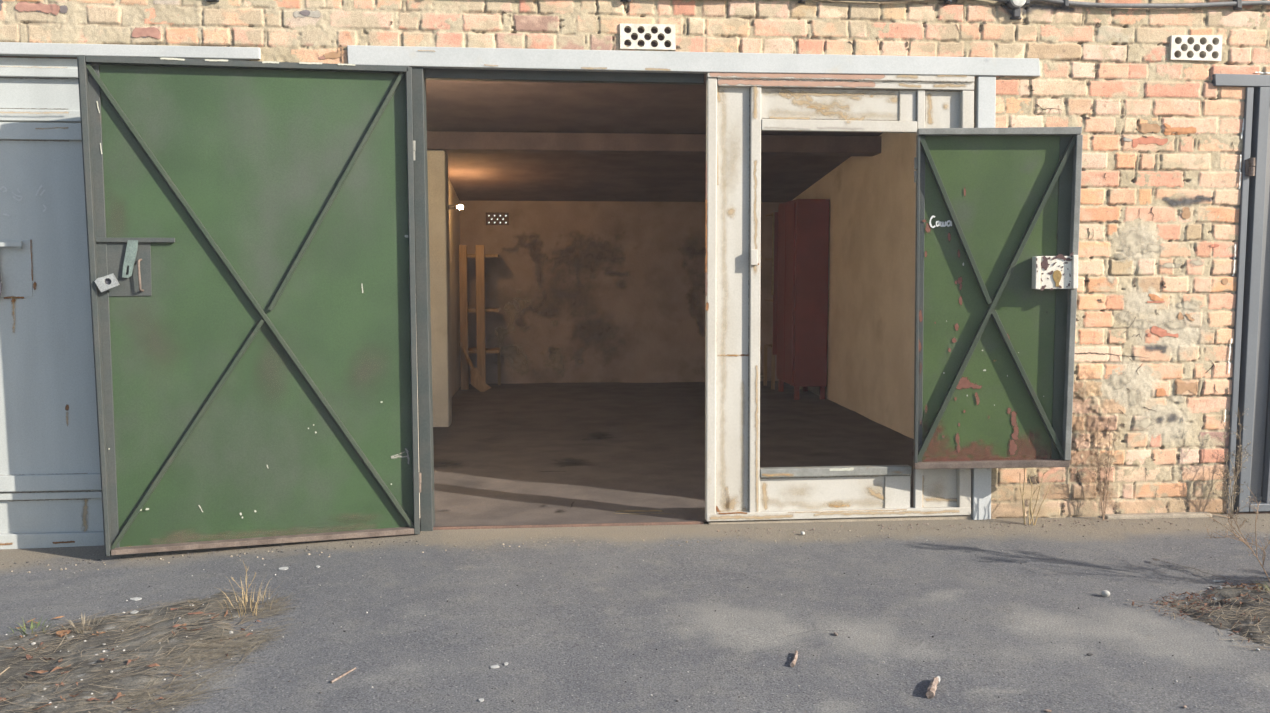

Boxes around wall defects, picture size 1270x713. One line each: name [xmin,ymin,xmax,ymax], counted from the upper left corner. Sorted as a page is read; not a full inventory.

rust [4,240,36,332]
peeling [942,360,1033,455]
rust [52,498,88,544]